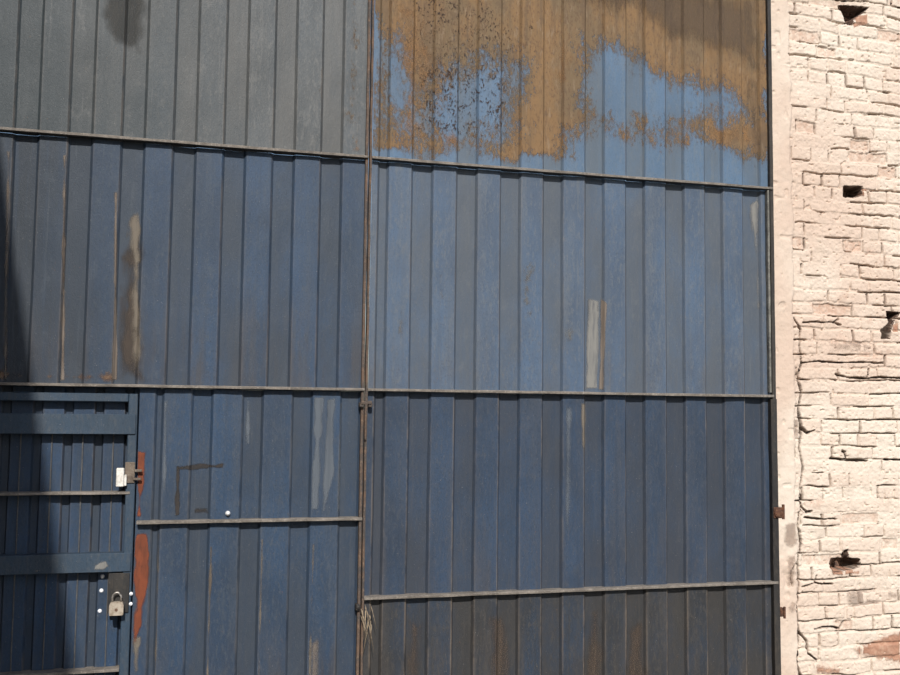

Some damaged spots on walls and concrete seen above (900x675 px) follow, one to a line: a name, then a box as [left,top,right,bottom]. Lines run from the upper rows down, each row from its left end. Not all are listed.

hole [837,5,868,27]
hole [843,186,866,198]
hole [880,311,900,339]
corrosion [137,452,145,495]
hole [829,550,861,575]
corrosion [134,534,149,664]
peeling [857,633,900,662]